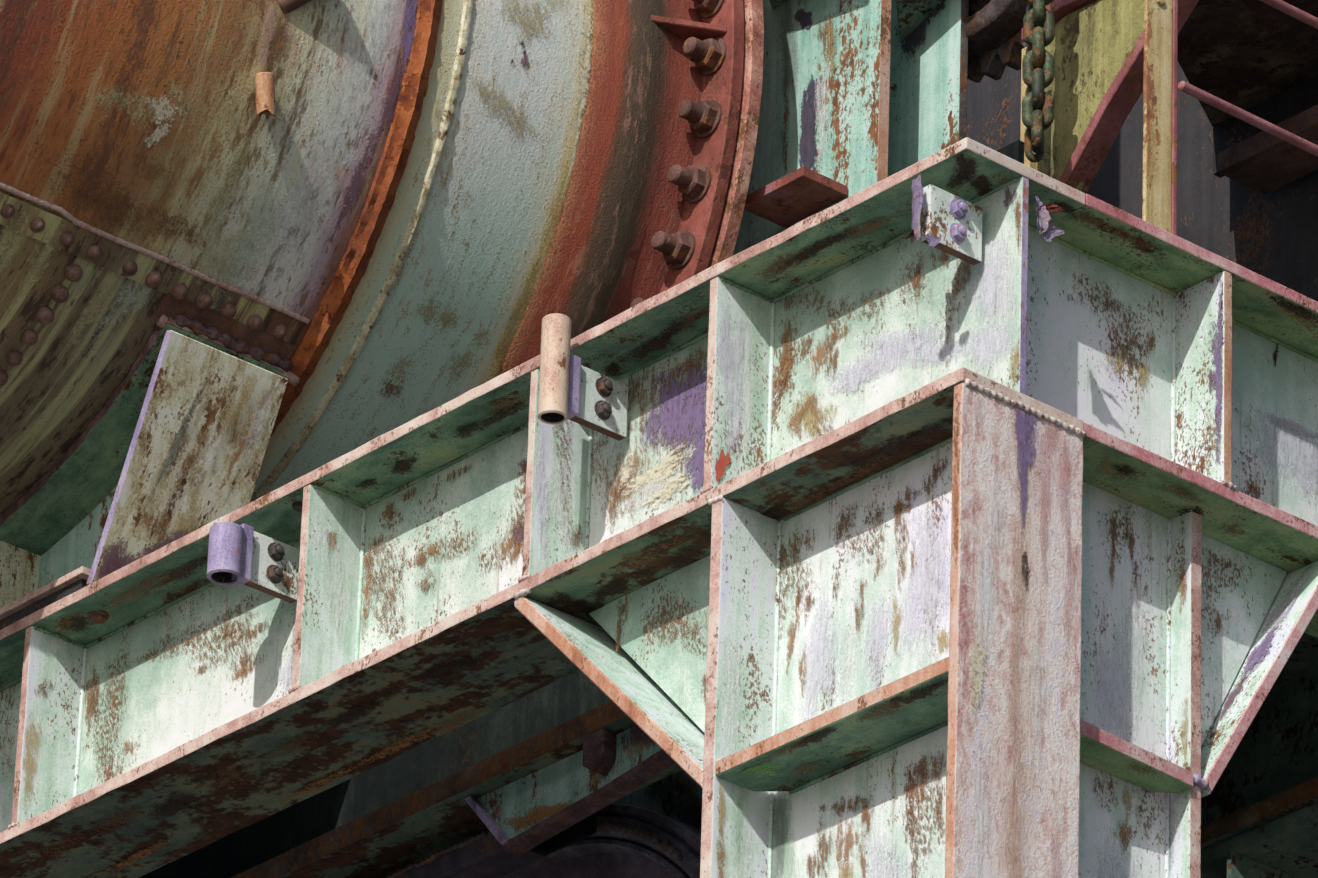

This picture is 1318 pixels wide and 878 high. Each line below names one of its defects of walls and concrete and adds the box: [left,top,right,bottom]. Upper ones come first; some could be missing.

corrosion [326,0,418,253]
corrosion [815,13,836,151]
corrosion [749,210,972,440]
corrosion [1067,273,1156,385]
corrosion [760,400,959,696]
corrosion [22,717,42,797]
corrosion [84,594,273,785]
corrosion [280,703,489,804]
corrosion [805,793,875,878]
corrosion [743,681,947,776]
corrosion [903,746,946,878]